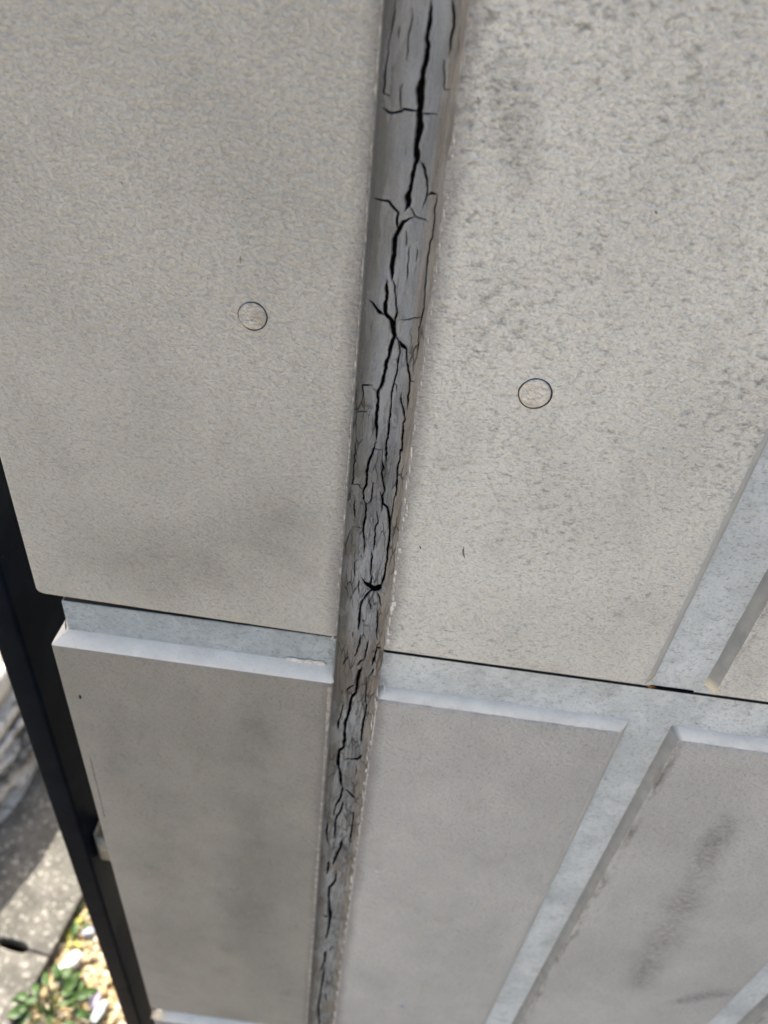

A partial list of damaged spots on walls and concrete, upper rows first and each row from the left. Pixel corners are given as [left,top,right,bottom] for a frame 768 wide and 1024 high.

crack [318,0,455,1024]